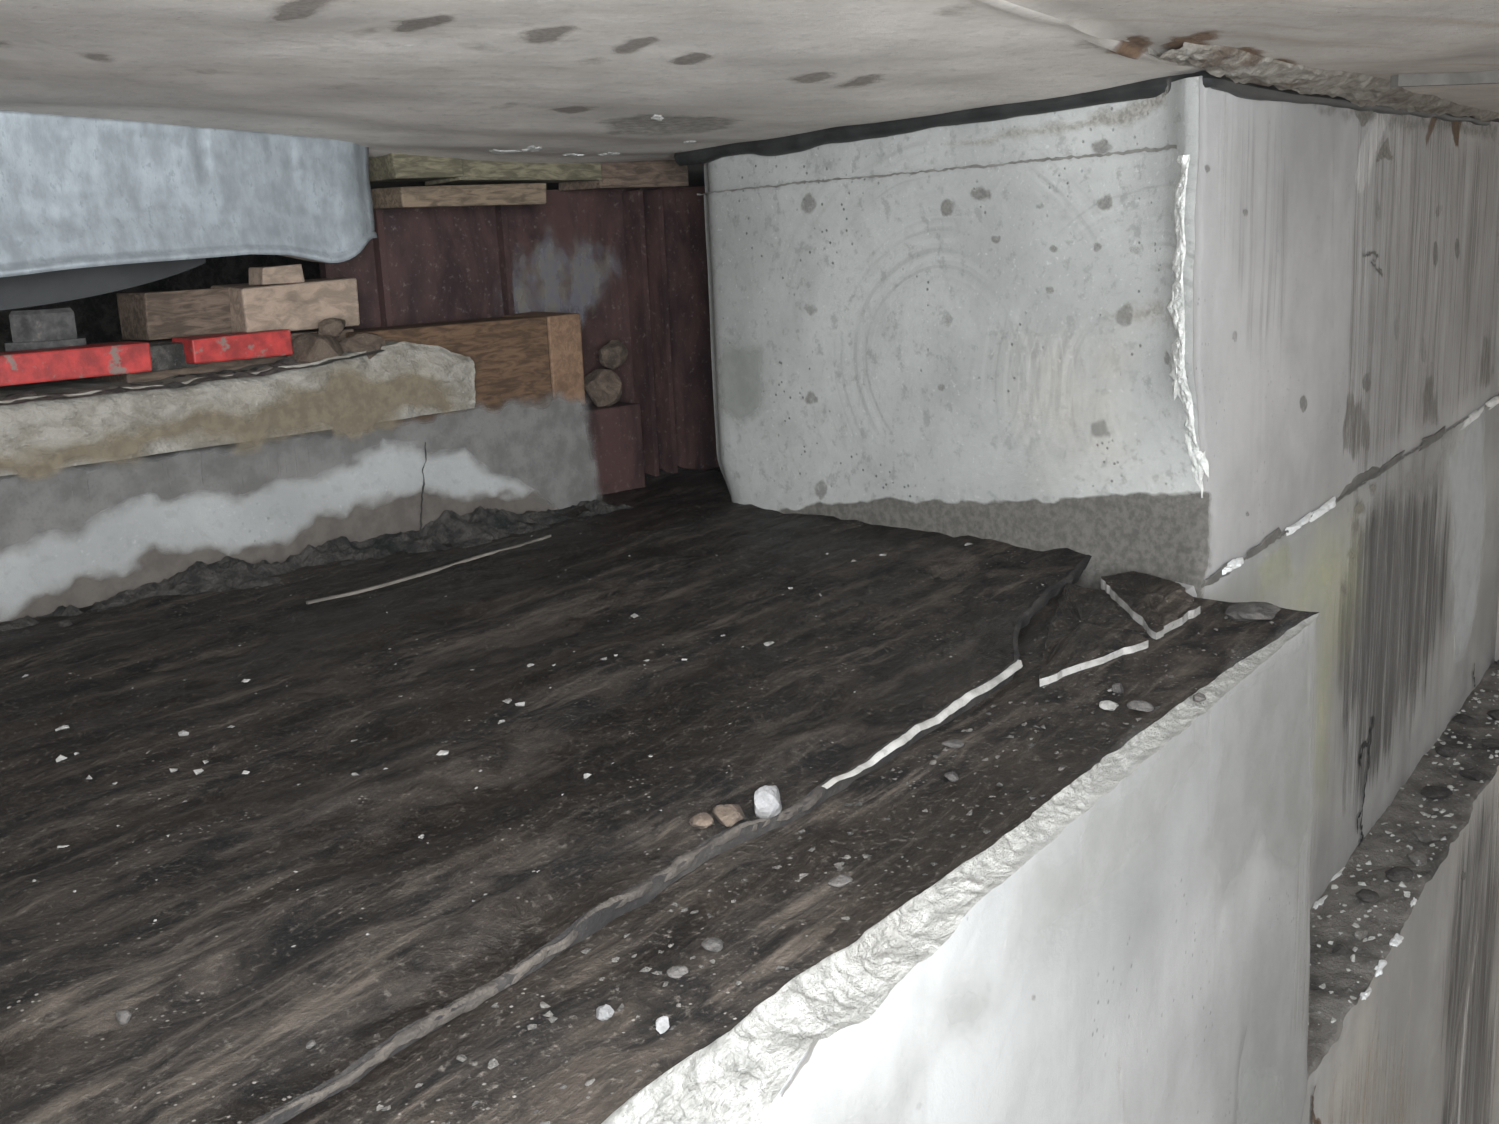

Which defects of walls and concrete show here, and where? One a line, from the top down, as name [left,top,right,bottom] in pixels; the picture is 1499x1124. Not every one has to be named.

damp [0,396,598,621]
spalling [780,155,1210,598]
damp [1222,557,1244,575]
damp [1285,496,1336,536]
damp [1338,139,1499,793]
crack [1357,716,1375,847]